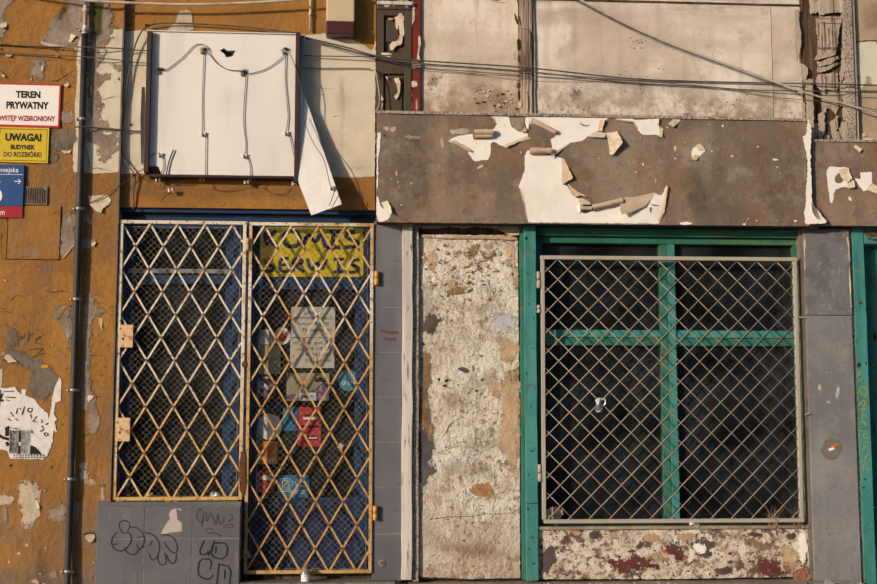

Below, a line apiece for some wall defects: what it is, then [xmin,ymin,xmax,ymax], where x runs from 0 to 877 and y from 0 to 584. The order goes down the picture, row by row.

peeling [381,3,415,57]
peeling [29,0,121,171]
peeling [381,76,418,111]
peeling [440,89,681,224]
peeling [827,166,877,203]
peeling [1,328,59,403]
peeling [52,290,107,436]
peeling [418,313,449,486]
peeling [482,332,534,473]
peeling [0,480,82,531]
peeling [454,477,503,497]
peeling [529,530,810,580]